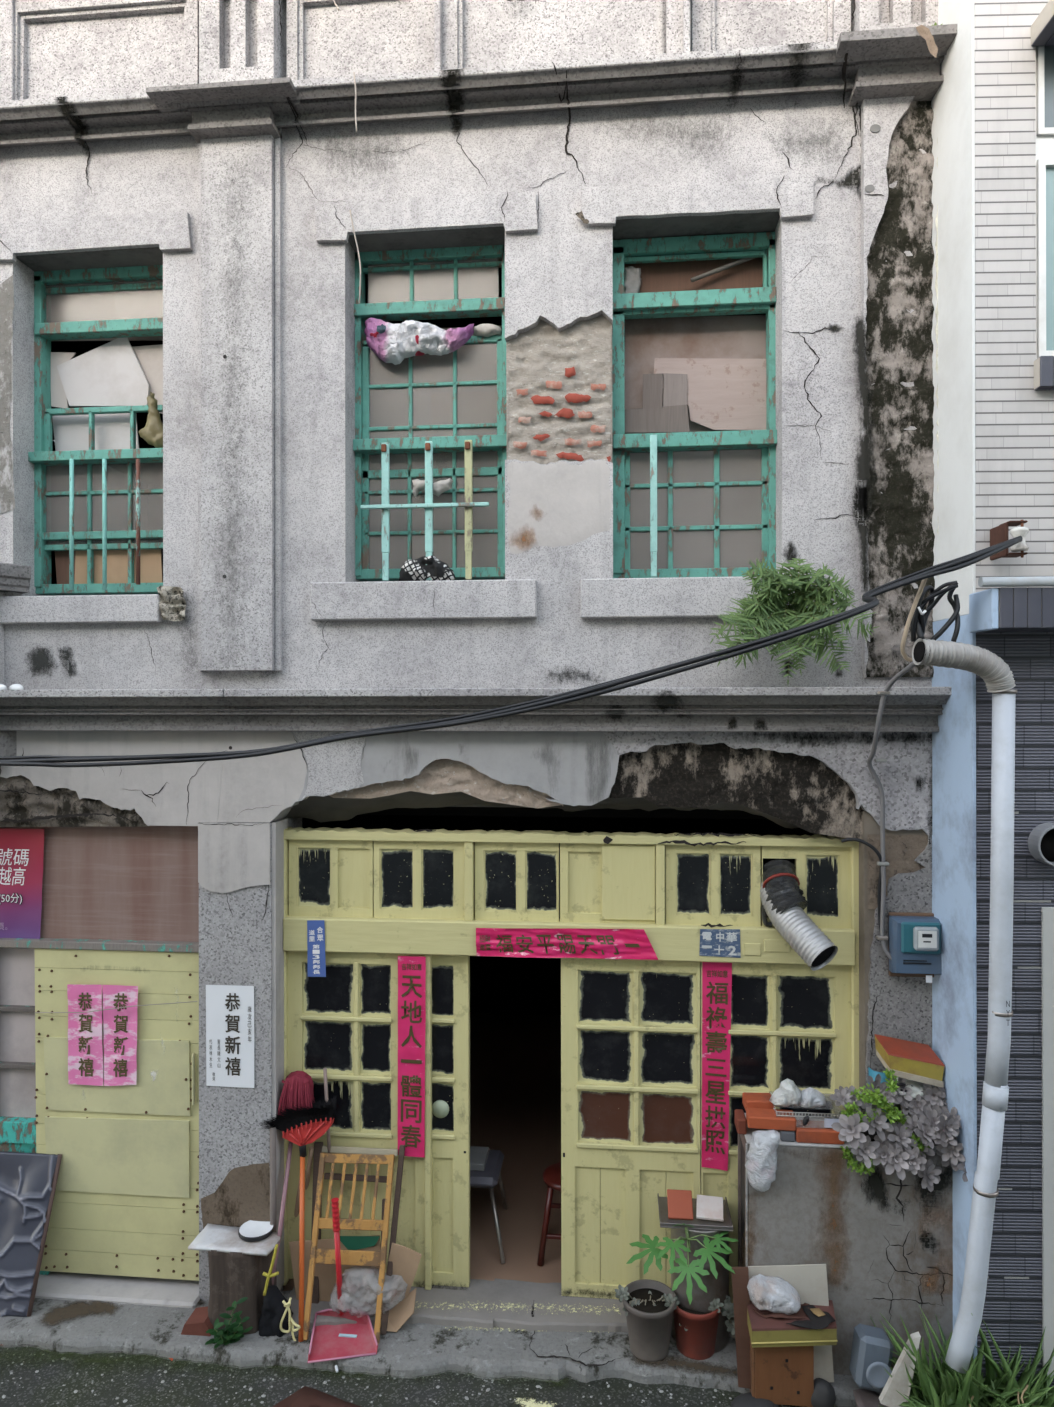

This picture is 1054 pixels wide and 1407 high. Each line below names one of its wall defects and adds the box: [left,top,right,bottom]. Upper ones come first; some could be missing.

crack [84,141,92,193]
crack [283,62,585,229]
peeling [0,275,15,514]
spalling [506,314,612,464]
crack [784,327,843,464]
damp [59,648,75,676]
spalling [0,775,149,827]
spalling [329,759,563,808]
spalling [610,742,928,909]
peeling [201,1163,270,1229]
damp [861,1166,953,1252]
crack [866,1179,952,1323]